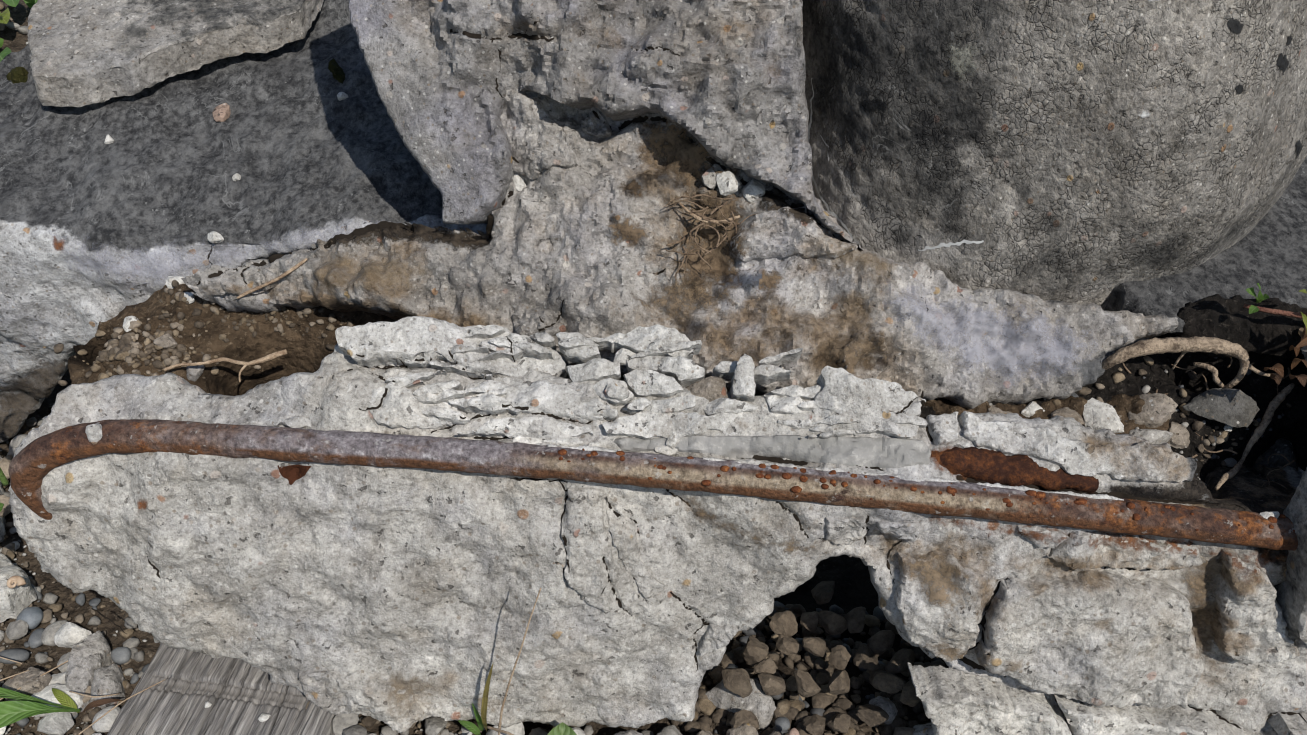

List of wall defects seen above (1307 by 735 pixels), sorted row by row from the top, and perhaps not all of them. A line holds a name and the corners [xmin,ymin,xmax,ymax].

spalling [207,231,224,243]
spalling [716,171,858,263]
spalling [165,265,280,304]
spalling [123,316,139,332]
spalling [335,310,1197,483]
corrosion [8,419,1298,573]
crack [666,489,691,507]
spalling [561,487,665,613]
crack [670,592,710,670]
spalling [698,624,741,656]
spalling [299,669,423,733]
crack [1188,705,1307,731]